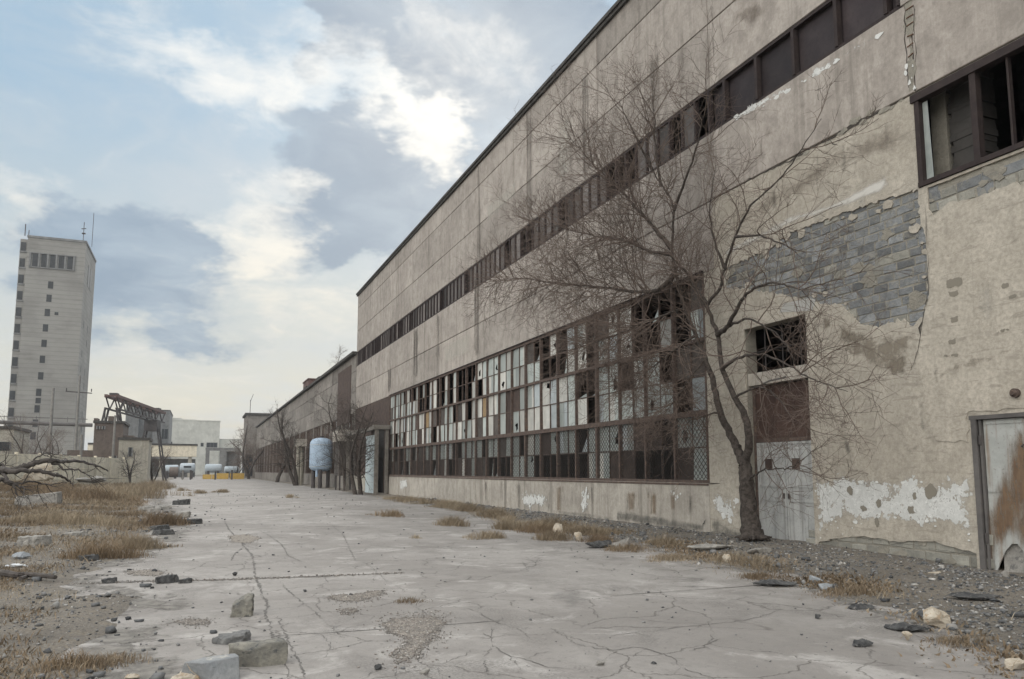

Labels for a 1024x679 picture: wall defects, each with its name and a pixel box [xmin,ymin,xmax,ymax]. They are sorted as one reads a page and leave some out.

spalling [734,46,860,121]
spalling [903,0,917,92]
flaking render [722,158,1024,372]
peeling [713,494,739,523]
peeling [806,473,995,569]
rust [990,433,1024,550]